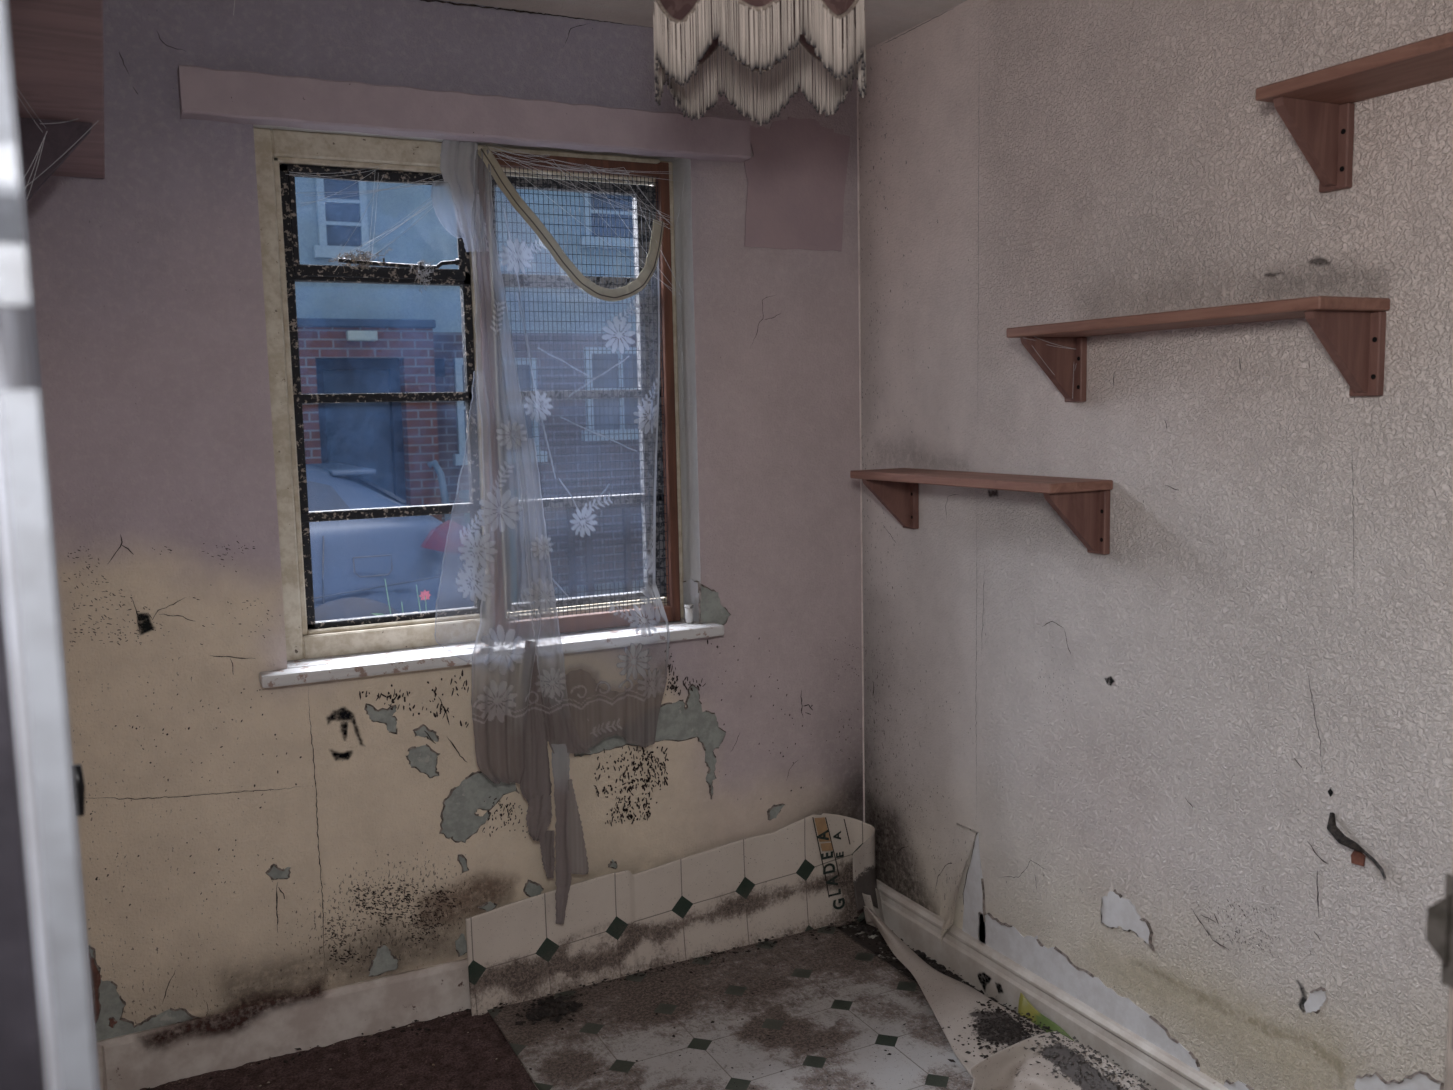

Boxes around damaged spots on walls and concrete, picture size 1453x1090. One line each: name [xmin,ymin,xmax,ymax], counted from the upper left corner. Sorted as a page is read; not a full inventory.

peeling [683,579,731,625]
peeling [364,703,440,778]
peeling [574,684,726,799]
peeling [439,771,519,873]
water stain [594,746,669,826]
peeling [265,864,291,880]
water stain [324,880,503,970]
peeling [962,832,1200,1072]
peeling [88,945,197,1041]
water stain [143,983,322,1046]
peeling [1304,987,1327,1014]
peeling [1354,1071,1444,1090]